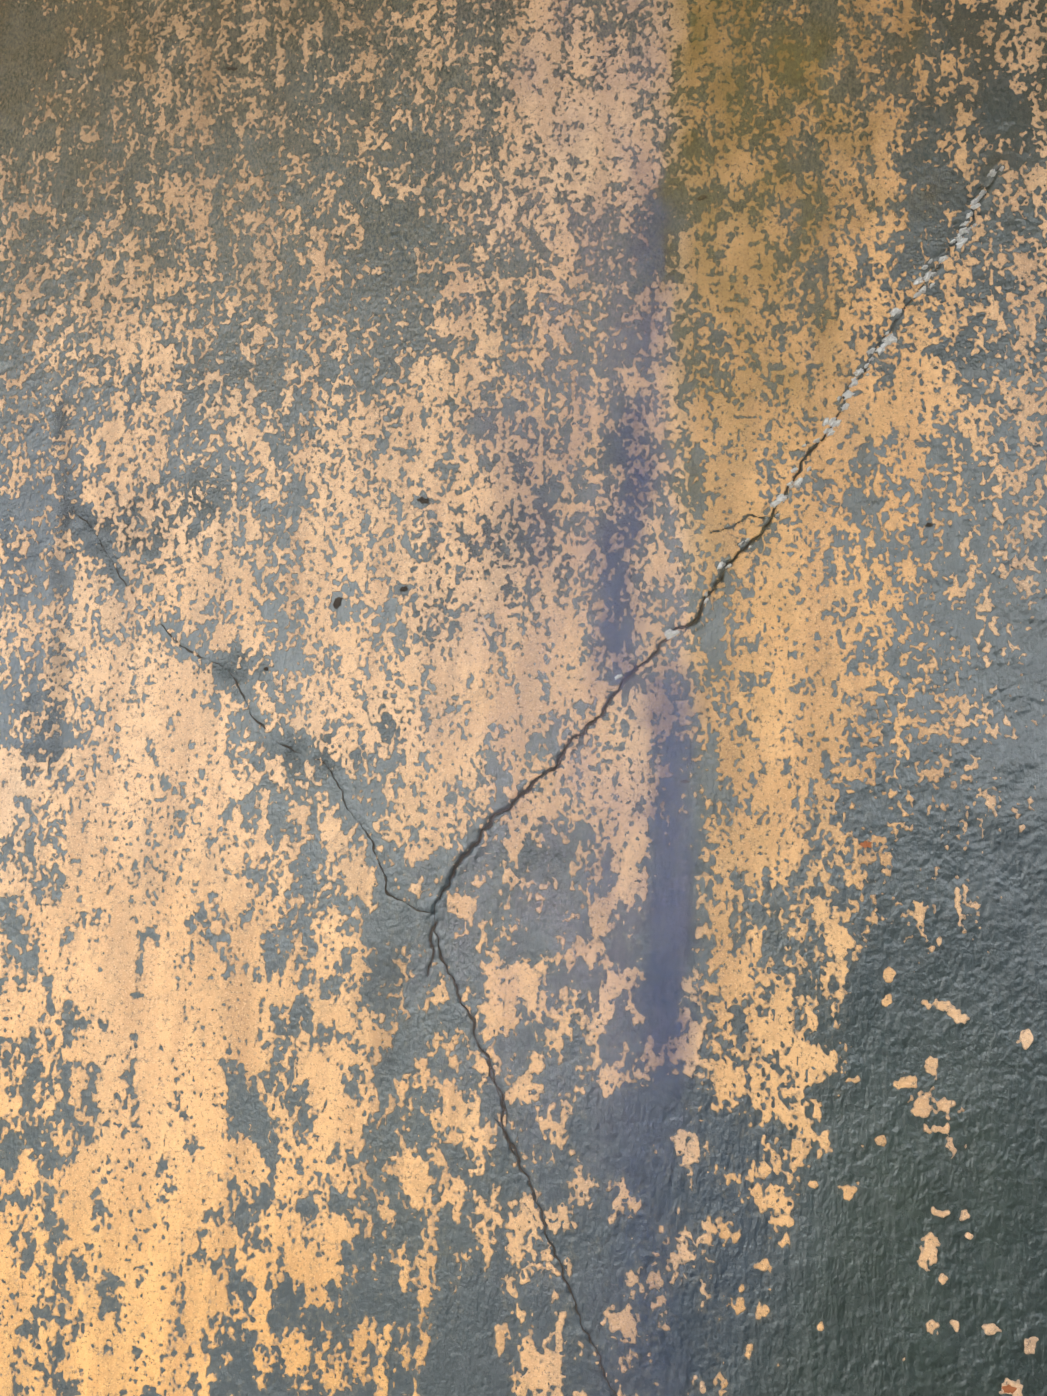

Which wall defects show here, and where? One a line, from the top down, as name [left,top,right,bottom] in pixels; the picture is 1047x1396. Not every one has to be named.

crack [76,166,1004,1396]
peeling [446,864,493,939]
peeling [892,897,942,954]
peeling [914,998,970,1024]
peeling [1016,1029,1034,1050]
peeling [893,1056,967,1159]
peeling [670,1129,709,1189]
peeling [606,1177,642,1225]
peeling [917,1207,973,1285]
peeling [600,1214,741,1396]
peeling [719,1258,772,1320]
peeling [509,1311,567,1396]